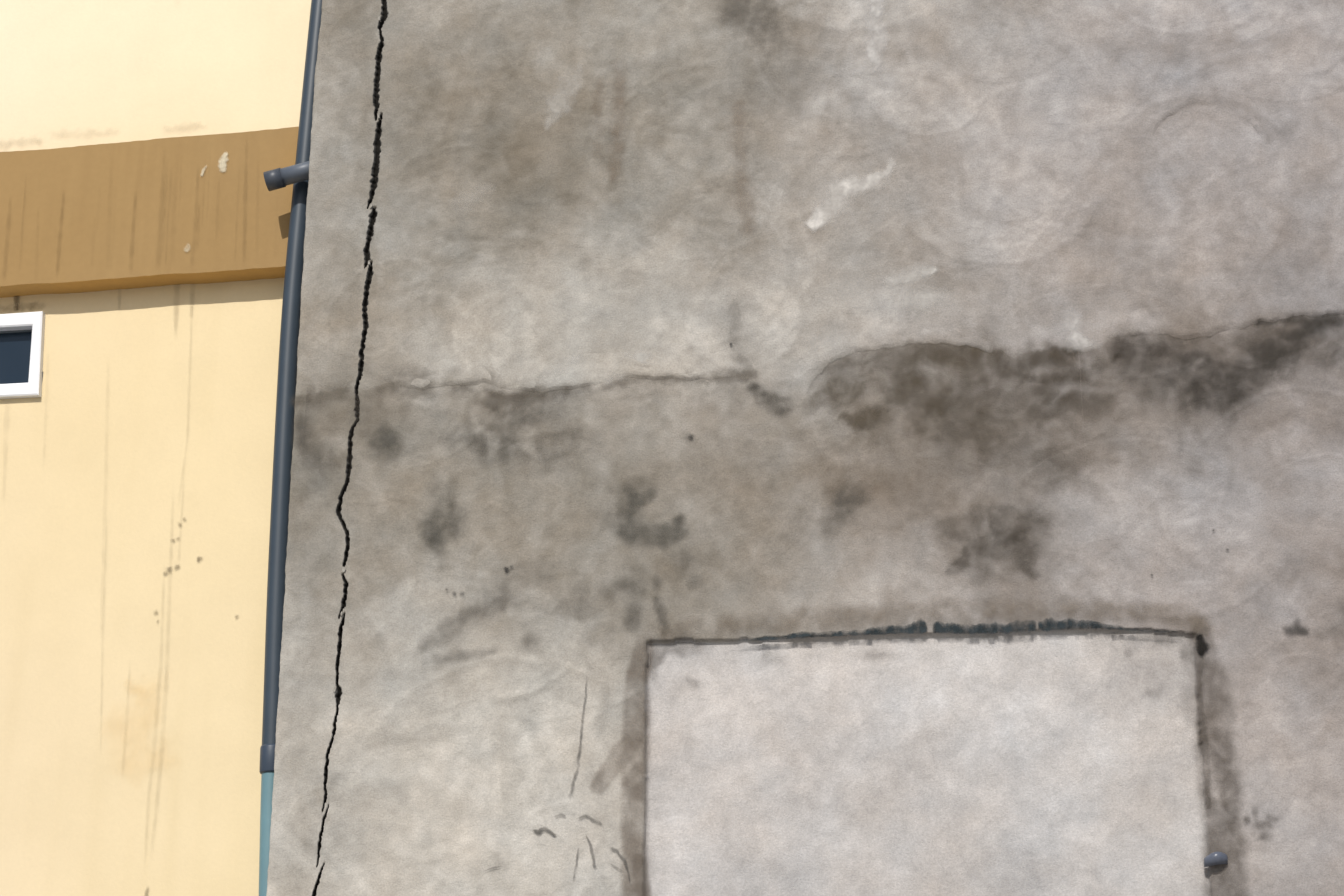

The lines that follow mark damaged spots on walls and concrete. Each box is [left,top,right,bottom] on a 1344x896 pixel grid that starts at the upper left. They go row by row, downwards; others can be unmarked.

damp [1032,323,1088,380]
damp [1258,316,1341,368]
crack [312,0,389,896]